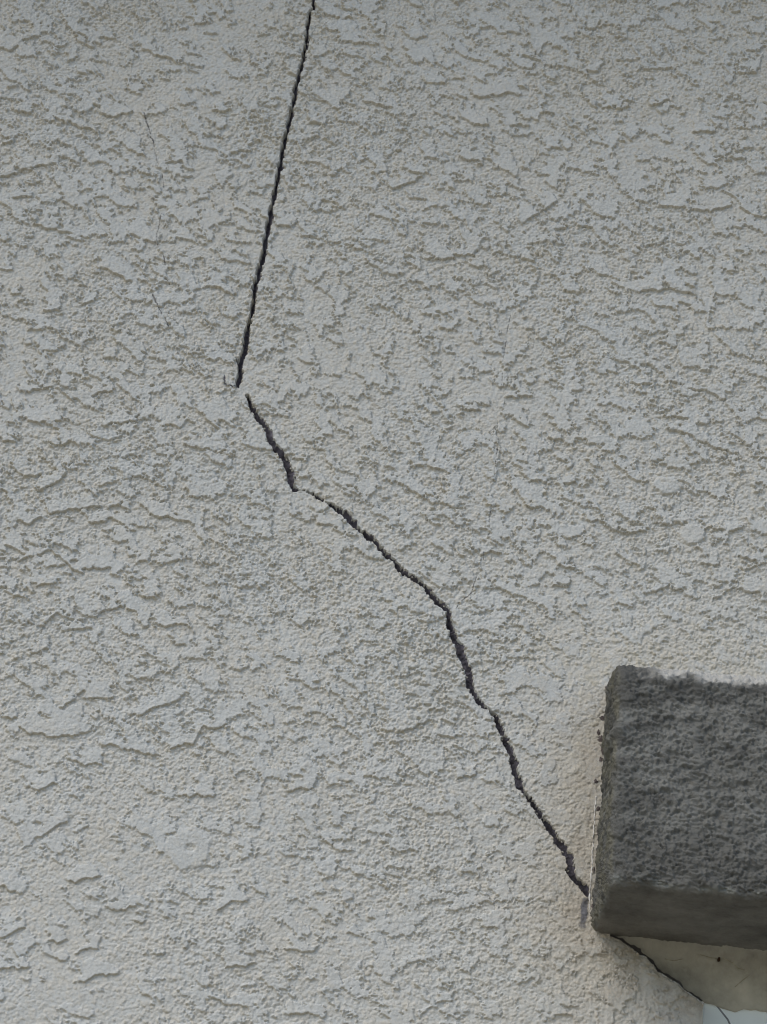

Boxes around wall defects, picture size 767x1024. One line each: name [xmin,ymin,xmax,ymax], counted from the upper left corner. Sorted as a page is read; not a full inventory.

crack [224,0,589,900]
crack [611,936,731,1024]